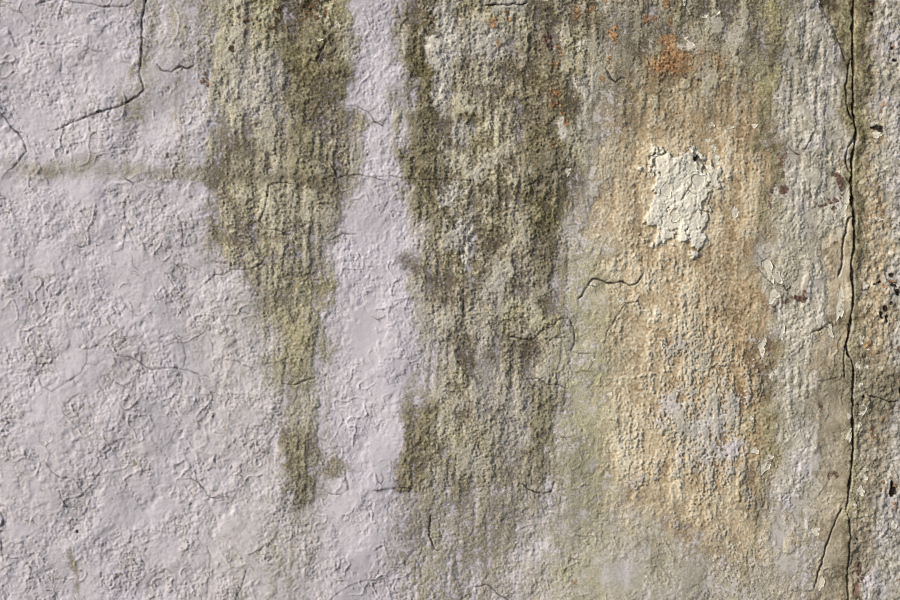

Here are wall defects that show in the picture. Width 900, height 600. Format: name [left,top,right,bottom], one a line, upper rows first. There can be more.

crack [73,0,191,122]
peeling [224,50,280,114]
peeling [419,0,459,109]
peeling [470,23,505,58]
peeling [556,117,568,140]
corrosion [643,0,702,77]
leakage [70,0,366,508]
peeling [437,180,475,280]
crack [579,276,642,298]
leakage [391,0,900,600]
peeling [571,0,900,600]
crack [814,8,895,600]